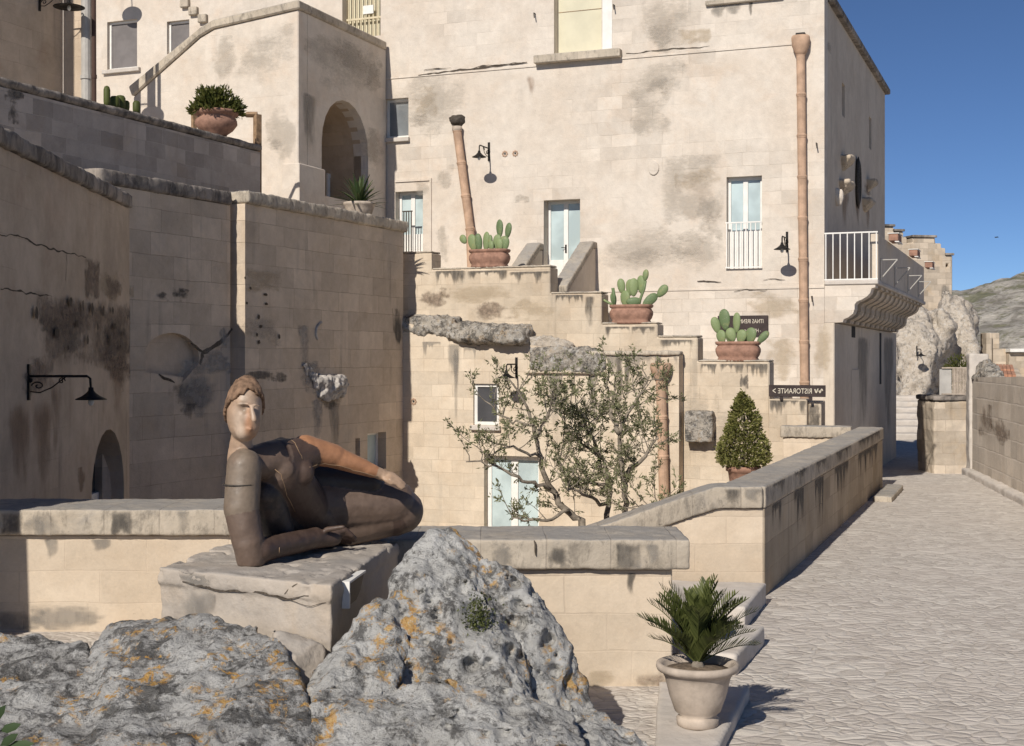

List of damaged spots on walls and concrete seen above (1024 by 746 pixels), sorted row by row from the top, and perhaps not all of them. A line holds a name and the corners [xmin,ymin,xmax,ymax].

crack [418,62,527,76]
crack [0,234,86,296]
leakage [436,270,548,280]
leakage [556,295,593,312]
crack [190,328,233,365]
leakage [773,431,880,515]